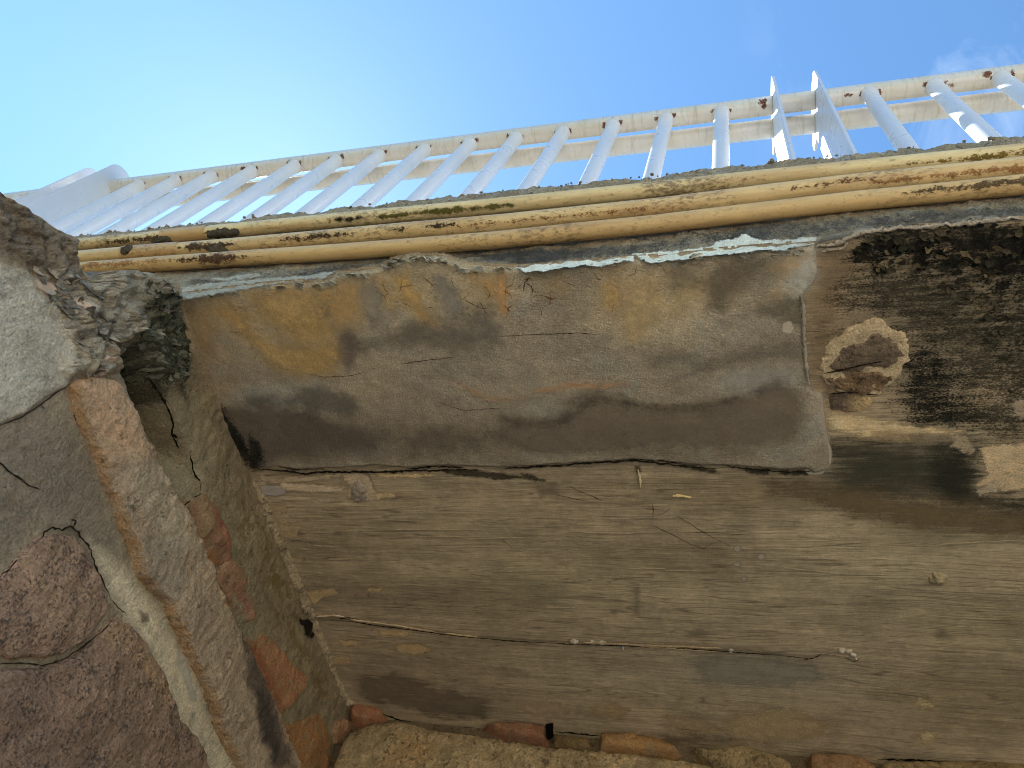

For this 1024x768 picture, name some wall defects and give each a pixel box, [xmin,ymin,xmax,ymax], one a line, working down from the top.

peeling [33,264,195,382]
crack [148,377,201,505]
leakage [221,389,375,472]
spalling [257,272,370,291]
crack [258,459,810,482]
peeling [381,216,1024,422]
leakage [454,207,1024,541]
spalling [828,412,1024,496]
crack [1,519,126,667]
crack [331,617,861,662]